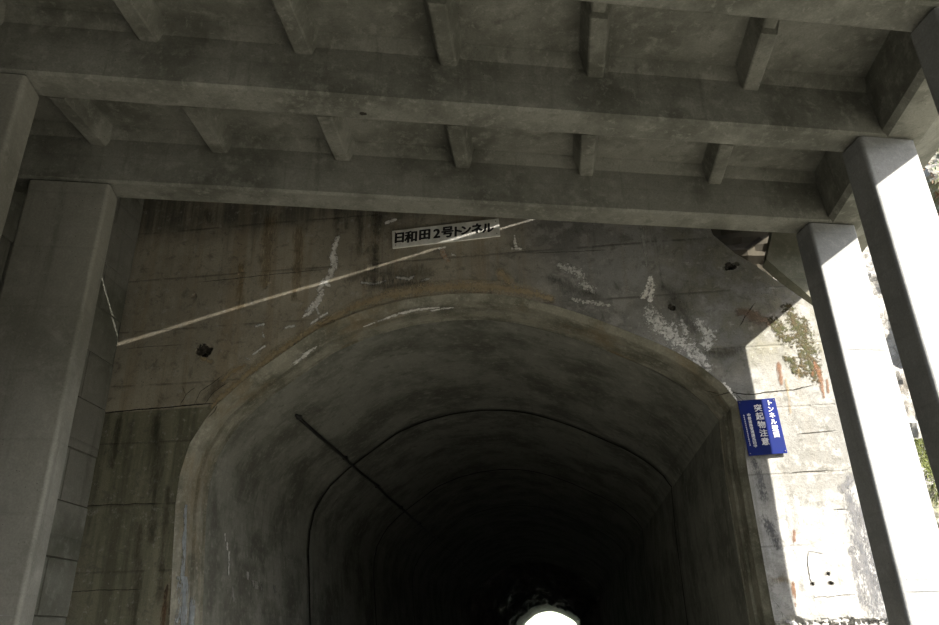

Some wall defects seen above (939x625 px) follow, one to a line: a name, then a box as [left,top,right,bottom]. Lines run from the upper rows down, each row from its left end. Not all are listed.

damp [302,235,340,325]
damp [641,227,717,372]
corrosion [812,362,830,398]